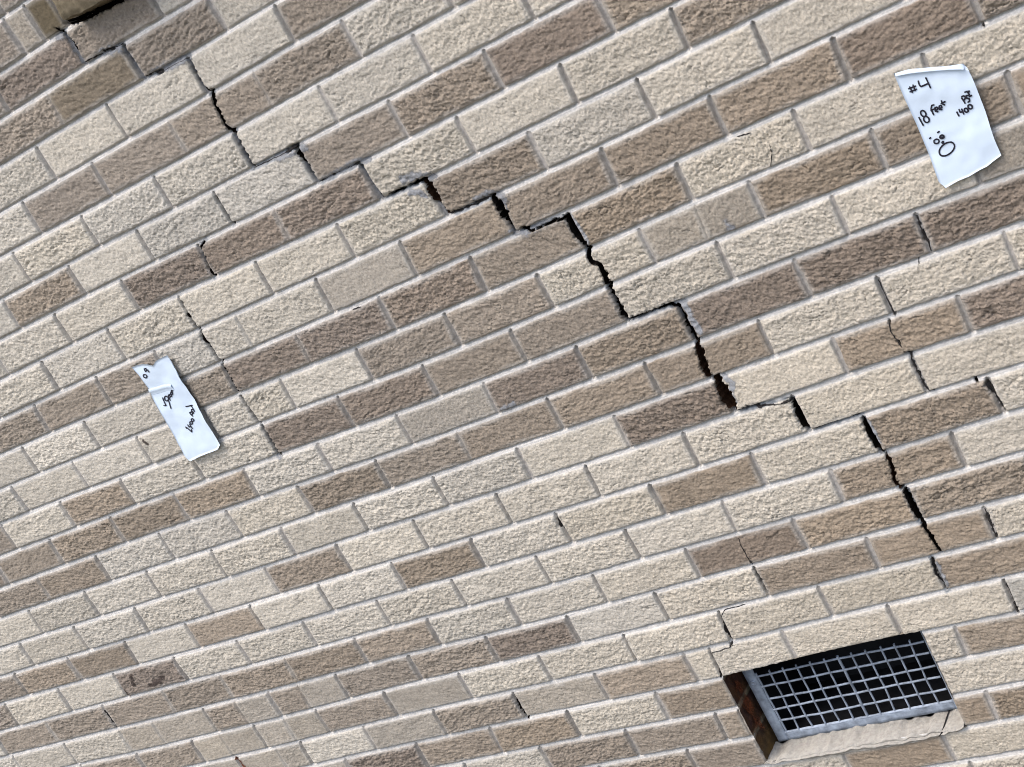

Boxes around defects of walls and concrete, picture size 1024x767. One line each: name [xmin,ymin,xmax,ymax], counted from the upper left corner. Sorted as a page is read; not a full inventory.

crack [56,27,126,62]
crack [206,87,364,181]
crack [187,313,239,391]
crack [381,177,948,589]
crack [975,376,1004,407]
crack [712,604,745,677]